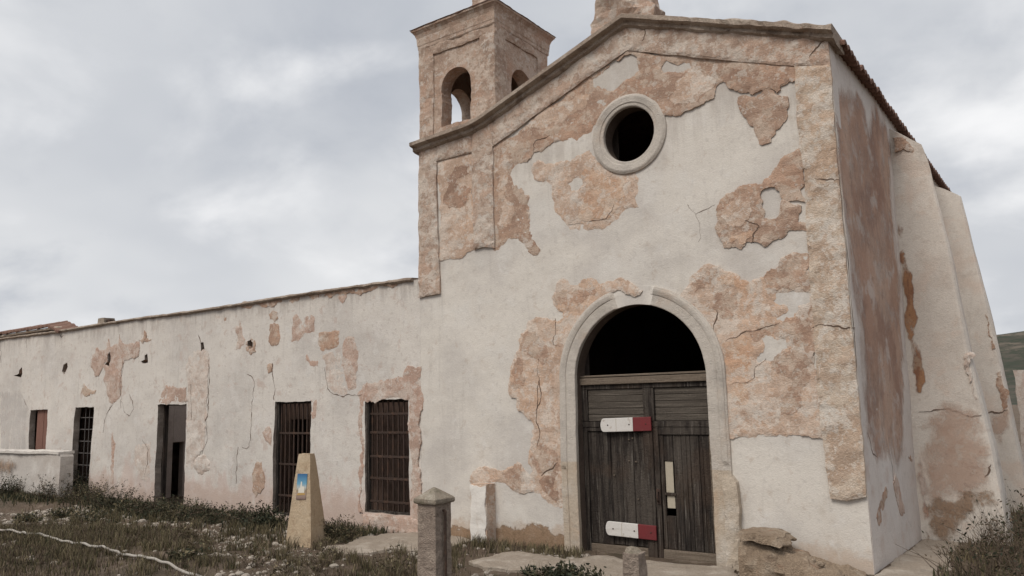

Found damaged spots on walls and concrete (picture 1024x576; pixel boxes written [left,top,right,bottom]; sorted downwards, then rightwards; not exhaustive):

flaking render [437,153,476,261]
flaking render [493,51,806,256]
flaking render [81,330,152,404]
flaking render [159,349,210,470]
flaking render [224,284,424,520]
crack [536,319,560,445]
flaking render [469,277,643,508]
crack [713,312,780,342]
flaking render [681,252,823,439]
crack [812,322,855,330]
damp [837,93,904,461]